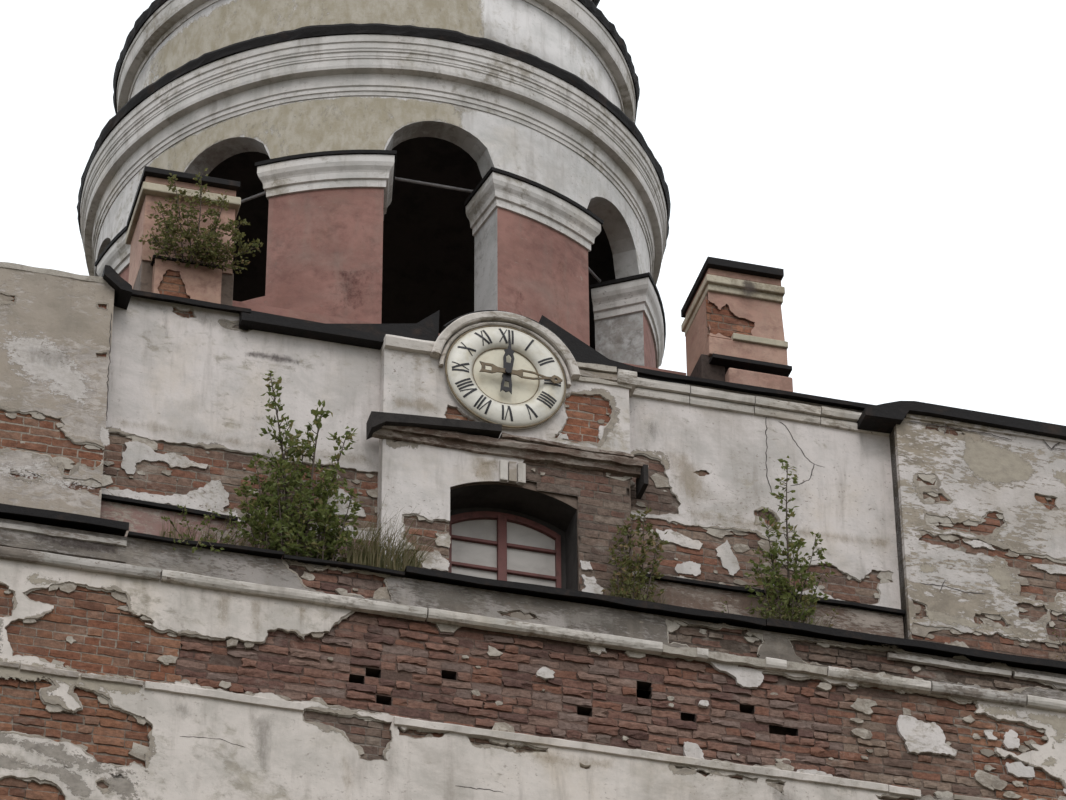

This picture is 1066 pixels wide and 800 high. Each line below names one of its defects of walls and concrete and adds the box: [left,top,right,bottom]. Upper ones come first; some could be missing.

flaking render [218,319,251,332]
flaking render [705,299,754,339]
flaking render [0,406,378,531]
flaking render [383,438,420,449]
flaking render [445,405,475,421]
flaking render [554,388,620,447]
crack [765,417,823,493]
flaking render [925,422,965,436]
flaking render [523,449,893,605]
flaking render [0,473,1066,800]